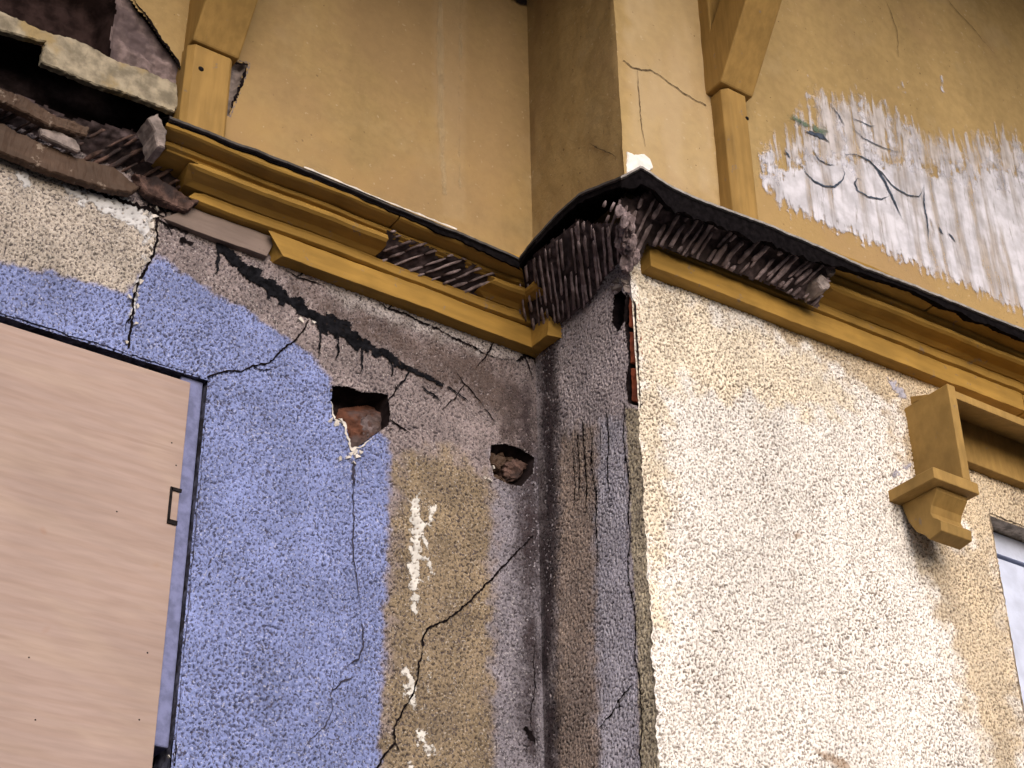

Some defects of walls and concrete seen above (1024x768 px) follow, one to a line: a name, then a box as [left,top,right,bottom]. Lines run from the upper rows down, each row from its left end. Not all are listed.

spalling [0,0,181,133]
flaking render [227,60,250,117]
crack [623,60,706,141]
peeling [60,182,153,258]
crack [53,177,536,433]
flaking render [610,278,645,408]
spalling [328,384,393,464]
spalling [483,442,538,486]
crack [301,463,364,755]
crack [376,535,534,768]
crack [523,642,538,744]
damp [518,344,559,768]